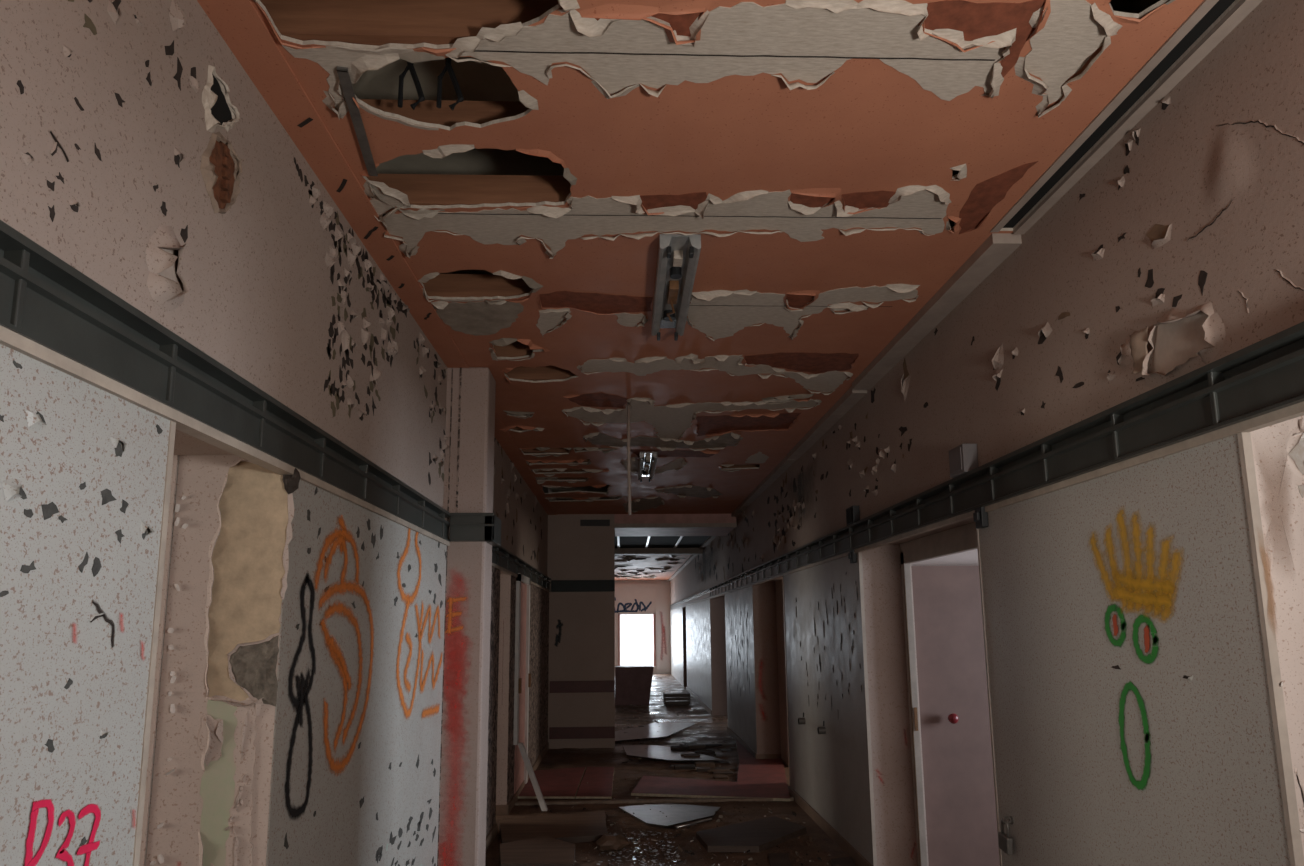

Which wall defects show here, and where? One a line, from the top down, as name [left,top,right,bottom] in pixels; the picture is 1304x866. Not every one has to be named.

peeling [579,0,712,45]
peeling [919,0,1051,77]
flaking render [165,0,242,214]
peeling [640,192,707,215]
peeling [790,188,896,214]
peeling [959,161,1038,235]
peeling [536,291,653,315]
peeling [741,352,861,374]
peeling [2,478,67,523]
peeling [101,489,129,513]
peeling [78,552,102,577]
peeling [375,799,436,866]